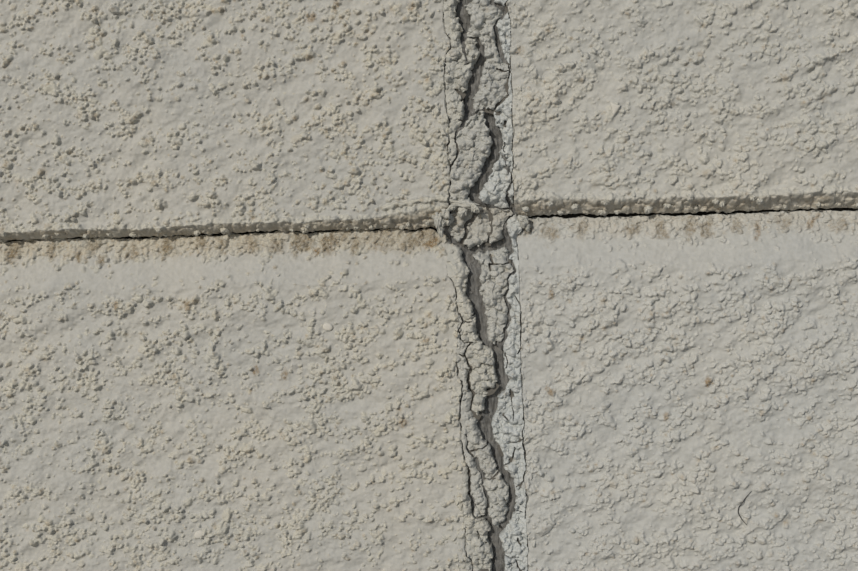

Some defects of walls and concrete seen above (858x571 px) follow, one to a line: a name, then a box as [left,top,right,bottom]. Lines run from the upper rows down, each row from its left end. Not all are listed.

crack [120,229,353,239]
crack [372,0,858,571]